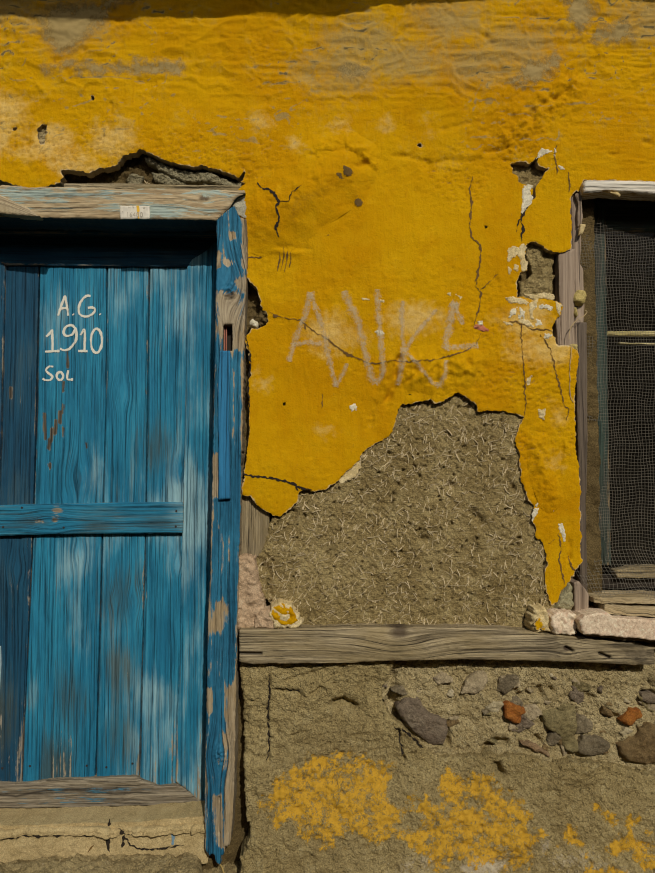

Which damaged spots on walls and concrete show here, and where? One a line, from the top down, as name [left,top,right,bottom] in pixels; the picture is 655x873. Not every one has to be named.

spalling [65,157,246,218]
crack [257,182,300,237]
spalling [511,148,565,214]
crack [270,176,498,364]
spalling [503,243,562,339]
spalling [256,393,559,628]
flaking render [382,641,655,773]